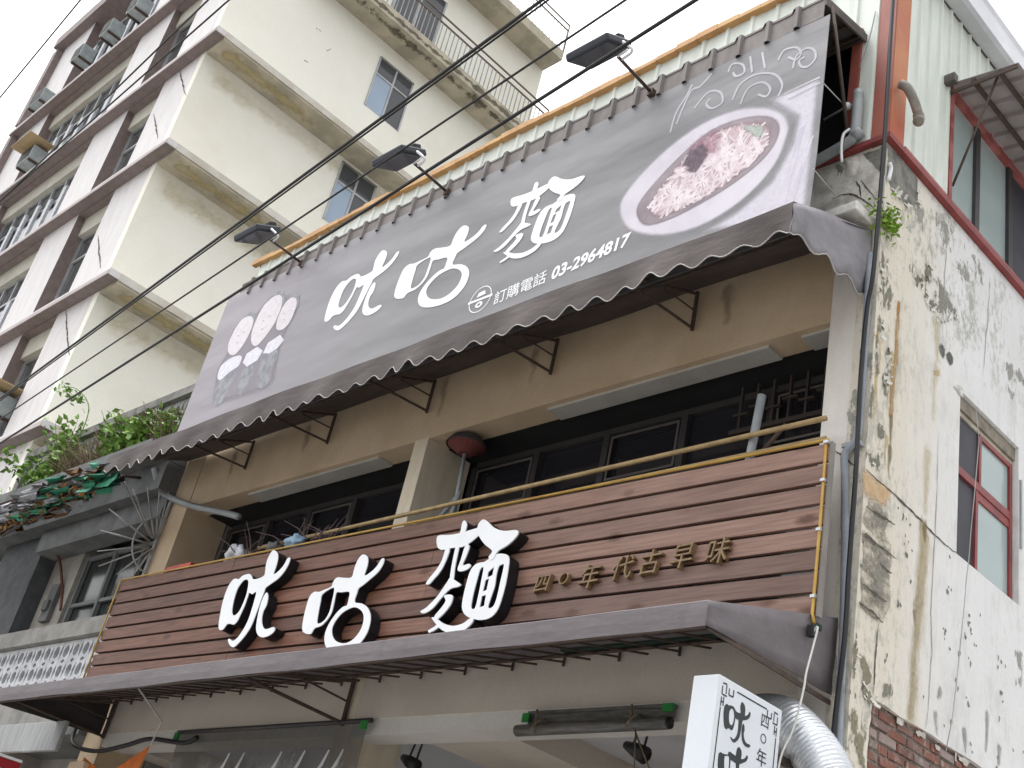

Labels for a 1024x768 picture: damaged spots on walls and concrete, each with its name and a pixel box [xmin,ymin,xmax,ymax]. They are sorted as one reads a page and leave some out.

water stain [357,0,520,129]
peeling [910,258,937,311]
peeling [866,252,894,472]
spalling [860,498,913,622]
crack [835,443,955,725]